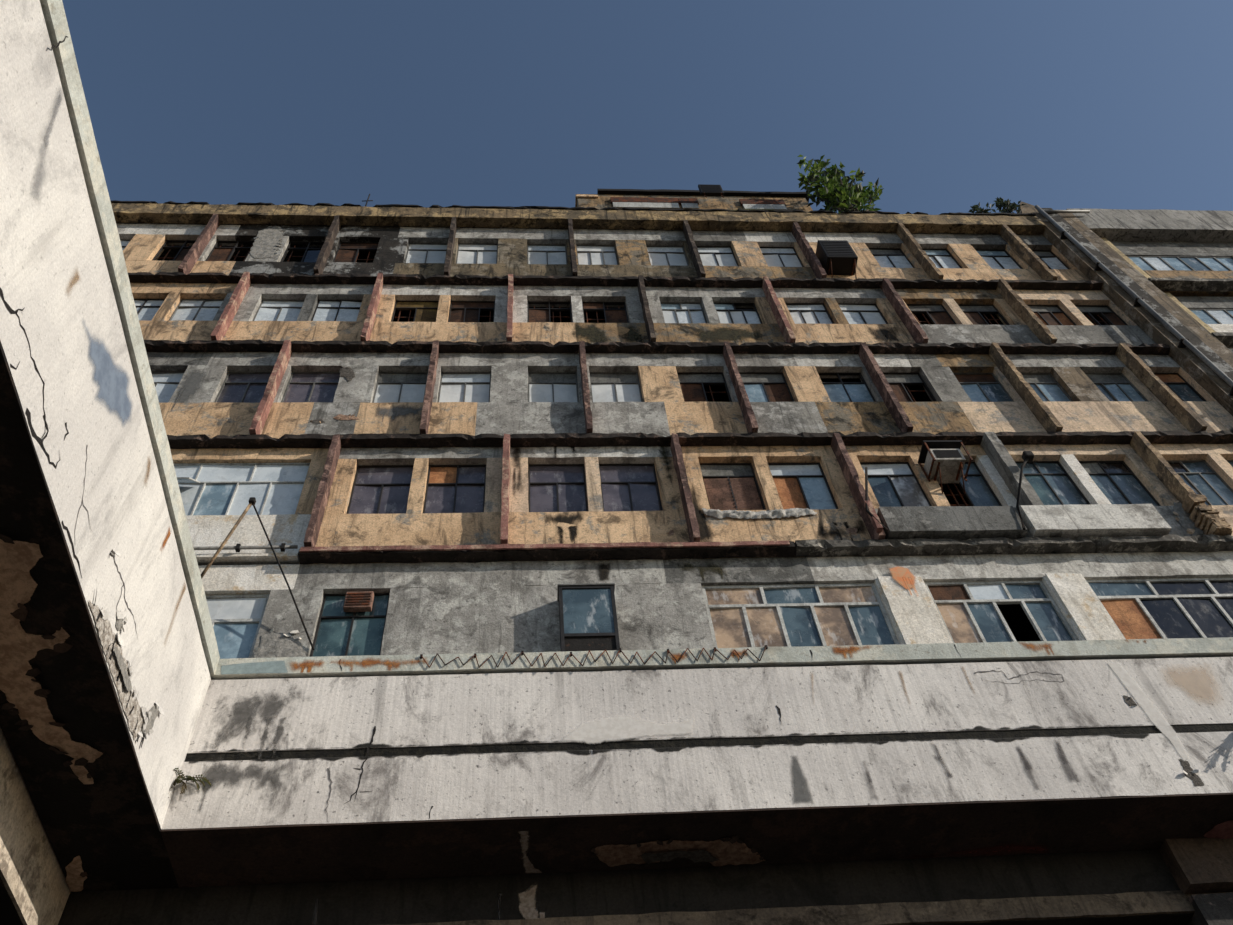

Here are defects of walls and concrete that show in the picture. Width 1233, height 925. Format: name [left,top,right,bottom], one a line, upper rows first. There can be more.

damp [89,337,131,423]
crack [0,288,91,577]
damp [546,514,582,544]
crack [112,549,138,639]
spalling [0,534,103,784]
spalling [89,590,165,748]
corrosion [293,659,426,673]
crack [325,726,376,820]
spalling [65,856,88,892]
spalling [590,836,770,867]